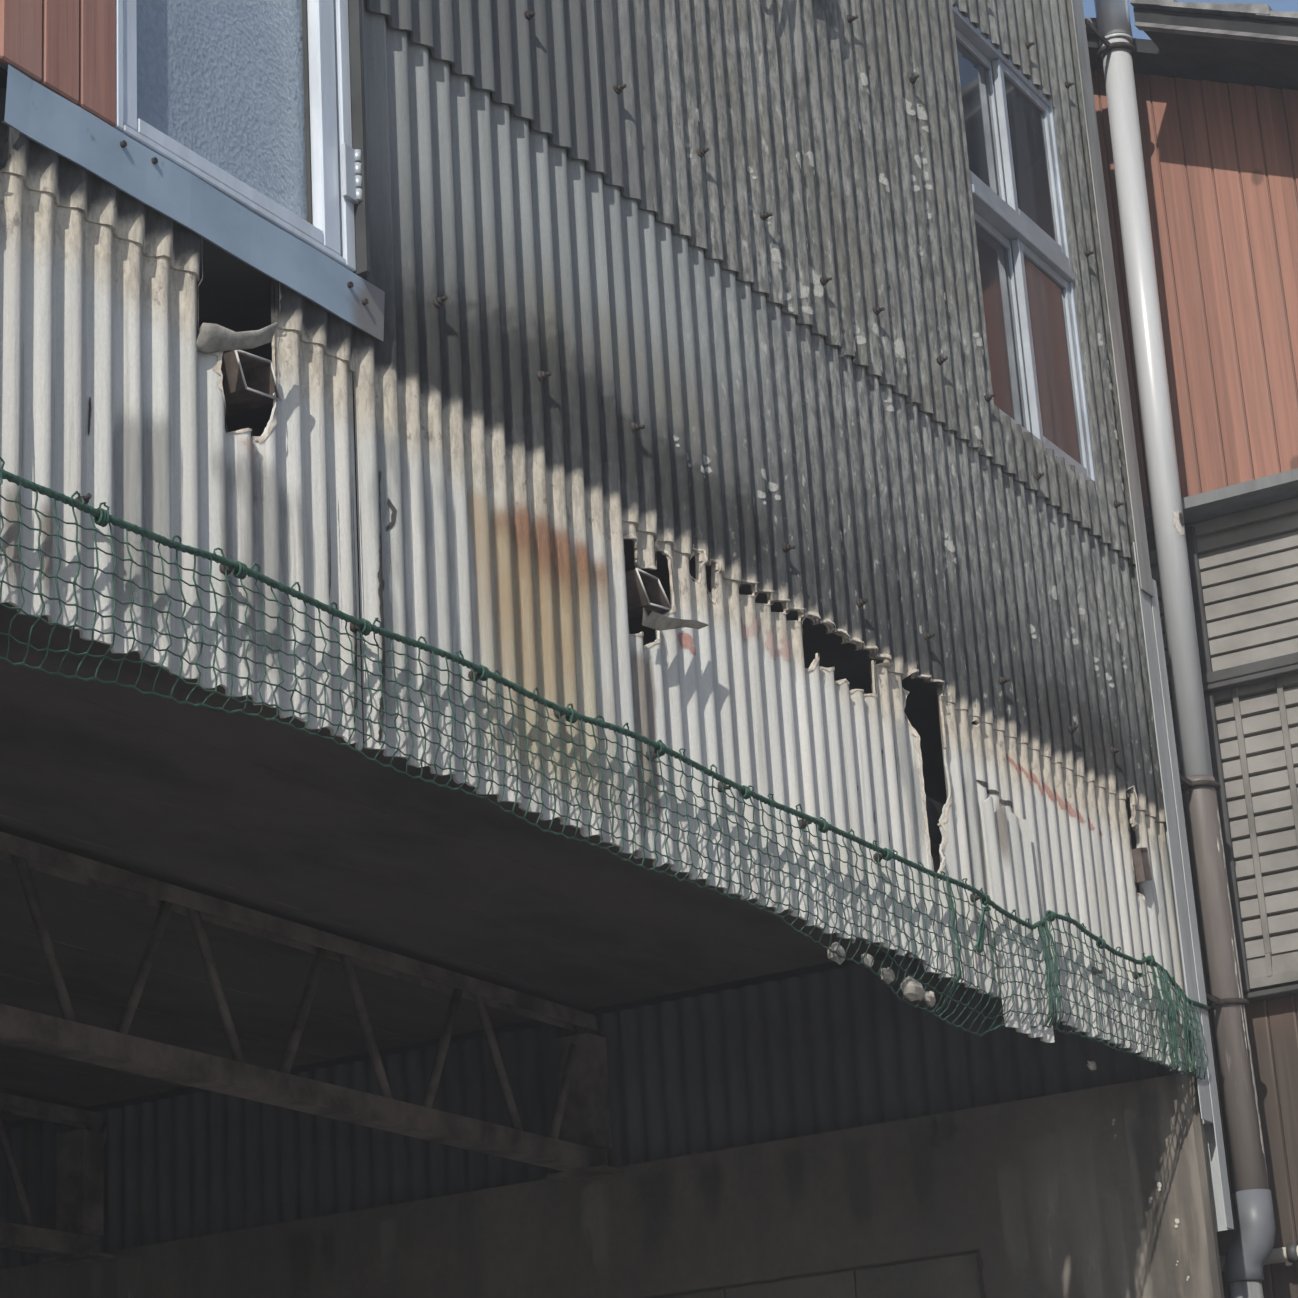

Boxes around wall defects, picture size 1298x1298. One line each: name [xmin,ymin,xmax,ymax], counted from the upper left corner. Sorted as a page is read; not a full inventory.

spalling [206,351,226,408]
spalling [226,403,278,443]
damp [114,424,171,615]
damp [220,440,304,658]
rust [511,509,591,579]
spalling [623,532,676,616]
spalling [629,631,661,649]
spalling [802,611,892,700]
spalling [902,669,952,880]